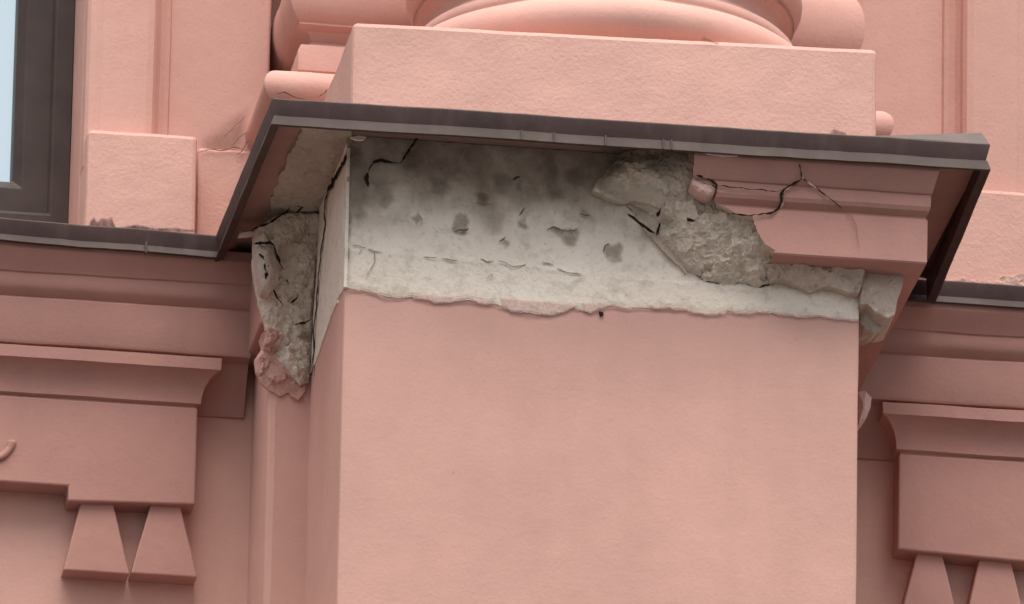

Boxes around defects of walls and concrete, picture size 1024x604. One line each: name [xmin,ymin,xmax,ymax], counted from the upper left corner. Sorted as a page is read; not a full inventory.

crack [199,118,249,155]
crack [251,138,418,376]
flaking render [238,128,905,386]
crack [697,164,859,246]